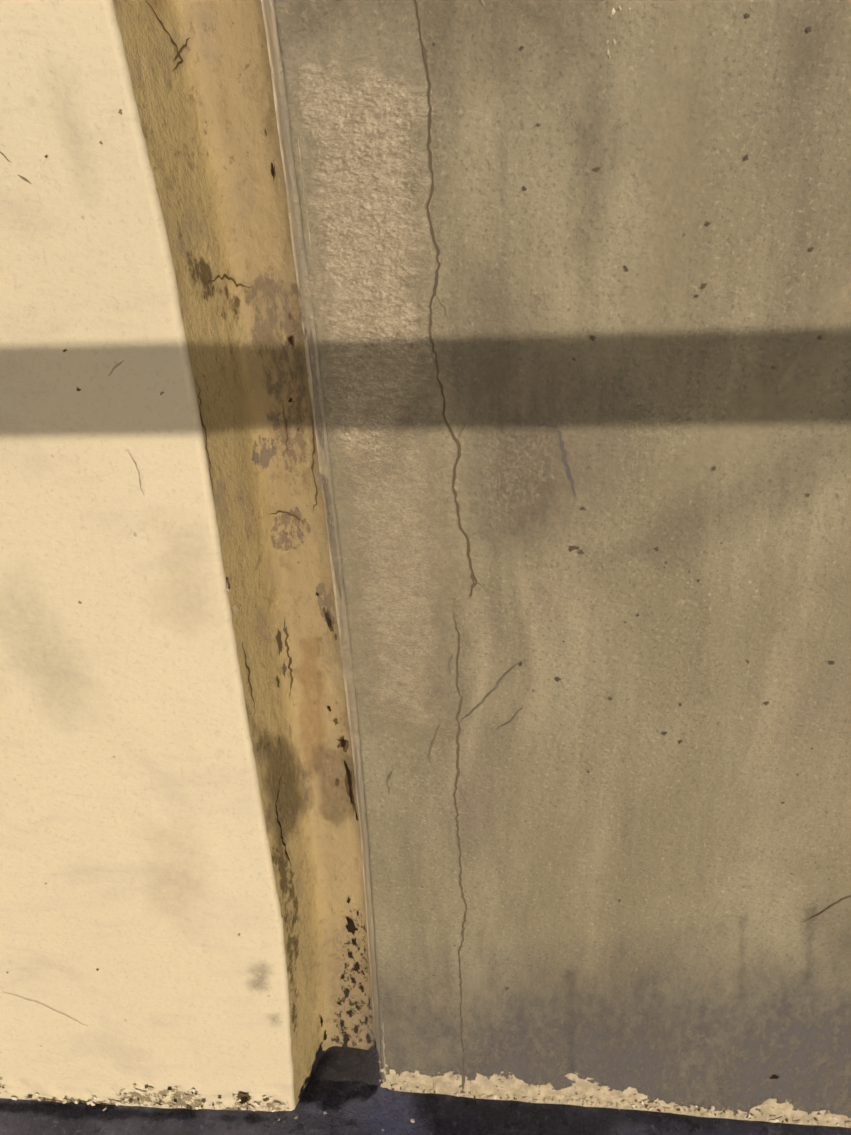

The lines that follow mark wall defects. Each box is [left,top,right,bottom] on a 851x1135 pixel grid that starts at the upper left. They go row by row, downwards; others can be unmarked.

crack [414,0,525,1090]
mould [319,897,372,1052]
peeling [379,1061,851,1128]